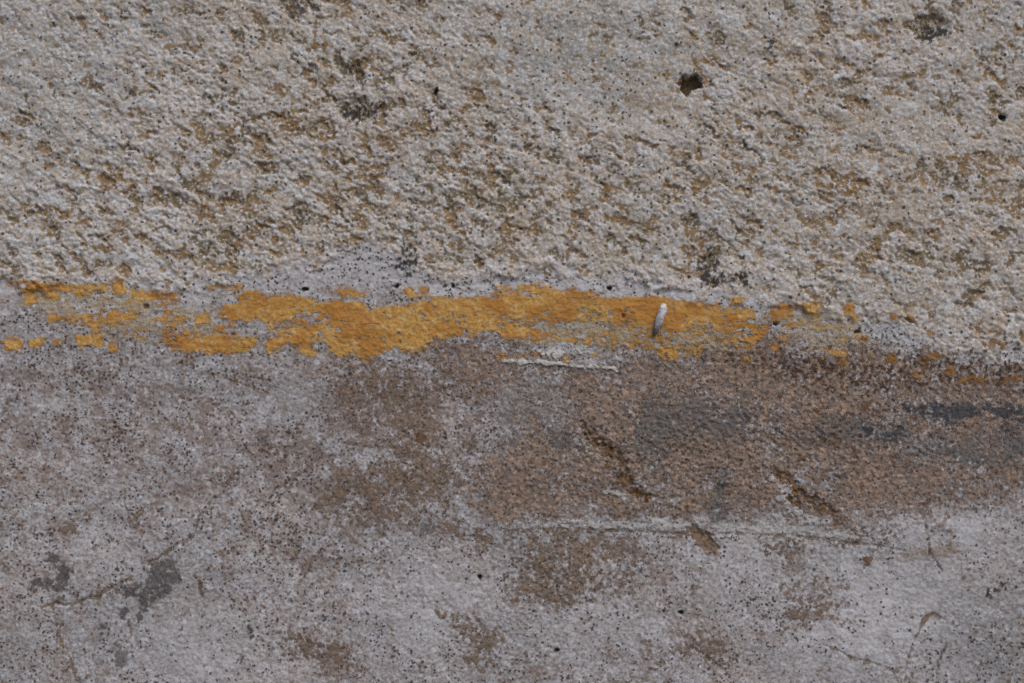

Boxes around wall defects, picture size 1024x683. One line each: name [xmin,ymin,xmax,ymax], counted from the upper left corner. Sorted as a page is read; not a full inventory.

peeling [1,276,869,372]
leakage [307,331,1024,613]